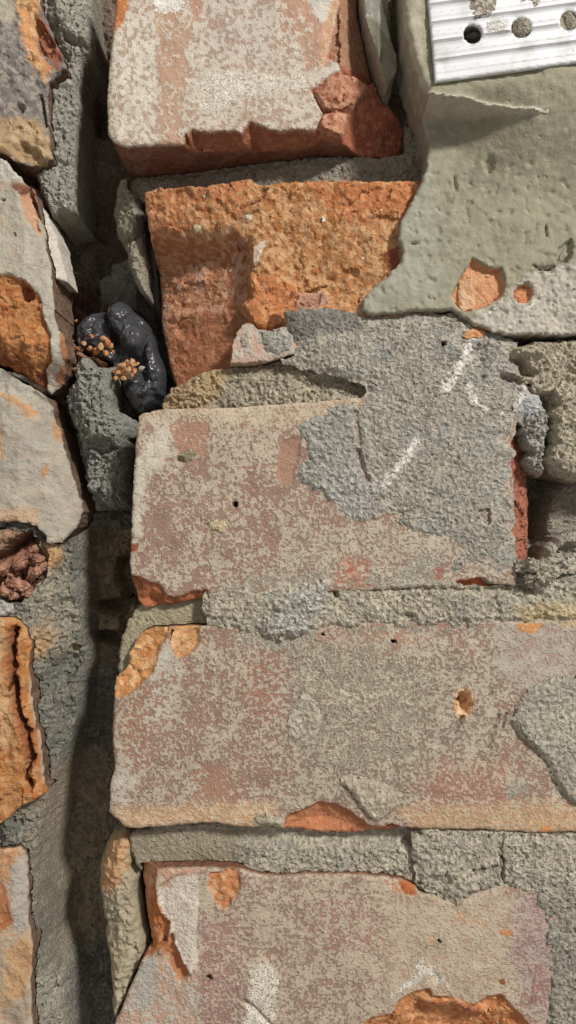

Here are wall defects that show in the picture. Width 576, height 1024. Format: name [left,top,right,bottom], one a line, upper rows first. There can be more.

spalling [310,63,402,159]
flaking render [425,91,549,121]
spalling [452,258,537,312]
spalling [463,327,486,339]
spalling [132,576,207,606]
spalling [115,625,200,697]
crack [8,626,37,785]
spalling [284,802,398,832]
spalling [143,862,170,955]
spalling [209,868,240,910]
spalling [364,963,545,1024]